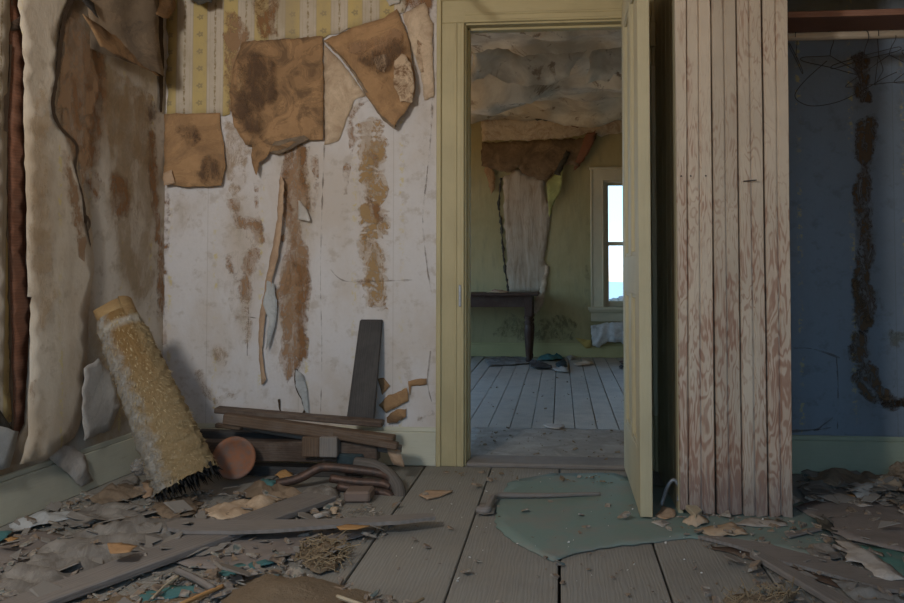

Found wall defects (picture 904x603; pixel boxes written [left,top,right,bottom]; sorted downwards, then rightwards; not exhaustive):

peeling [10,16,21,31]
peeling [82,0,159,76]
peeling [374,54,415,103]
peeling [251,135,309,175]
leakage [227,199,264,300]
leakage [275,145,319,380]
leakage [343,103,390,309]
leakage [848,117,904,412]